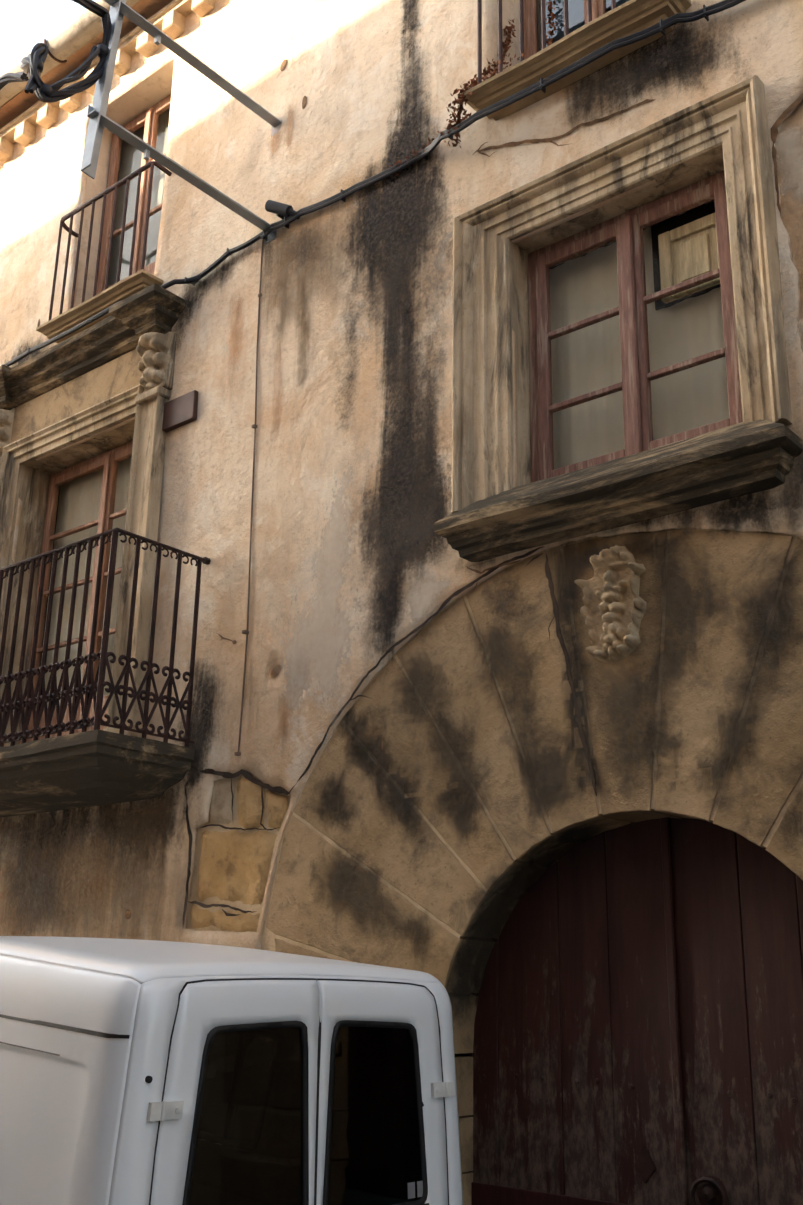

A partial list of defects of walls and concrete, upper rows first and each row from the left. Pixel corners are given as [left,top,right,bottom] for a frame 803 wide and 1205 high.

crack [474,99,655,157]
damp [567,23,720,125]
peeling [775,100,803,350]
damp [265,0,452,706]
damp [0,663,217,938]
damp [317,778,350,820]
damp [341,711,420,837]
damp [401,659,480,836]
damp [479,527,619,816]
damp [605,453,803,787]
damp [313,856,429,949]
damp [448,825,607,1016]